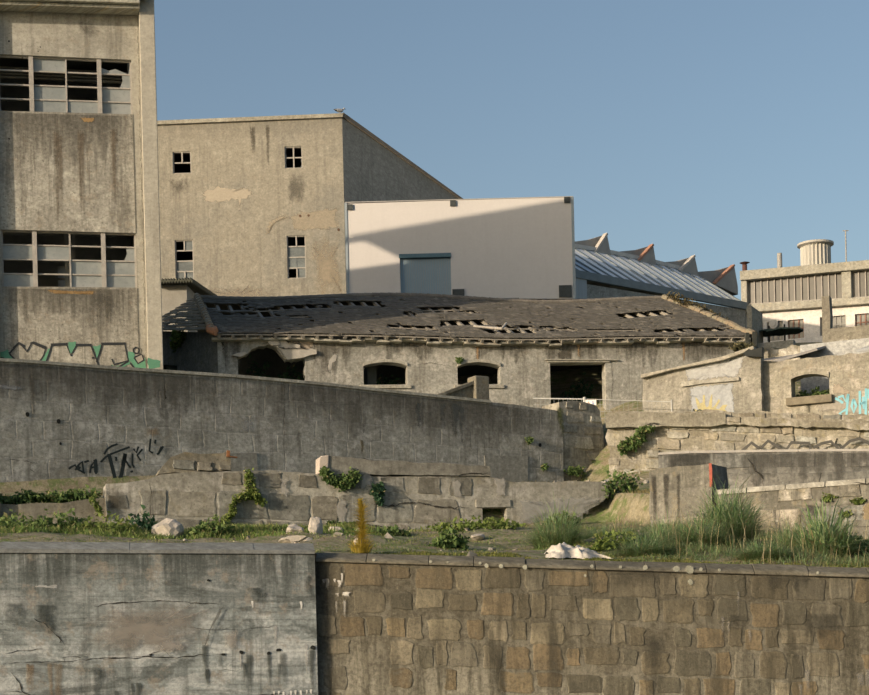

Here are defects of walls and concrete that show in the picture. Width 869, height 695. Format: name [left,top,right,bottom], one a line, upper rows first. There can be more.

crack [5,619,242,695]
leakage [239,654,252,676]